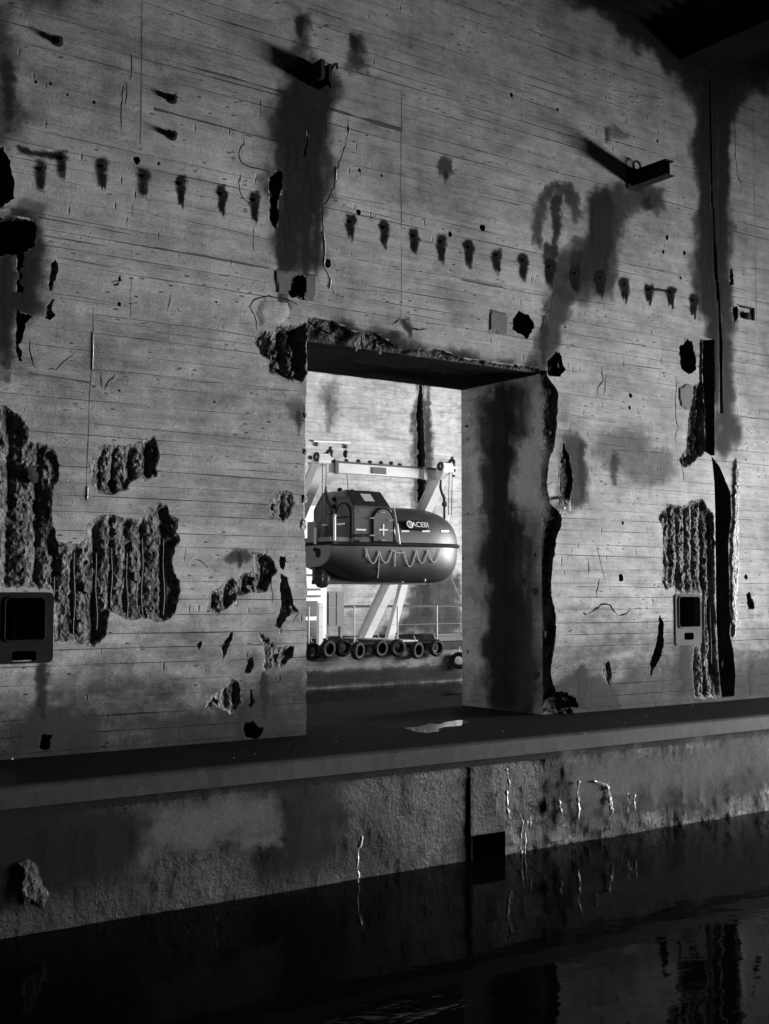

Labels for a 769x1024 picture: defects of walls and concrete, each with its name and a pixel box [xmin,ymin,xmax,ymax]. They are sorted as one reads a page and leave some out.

leakage [261,15,342,307]
spalling [0,405,181,647]
spalling [197,552,299,715]
spalling [254,317,579,715]
leakage [334,181,665,713]
spalling [512,311,534,340]
crack [583,546,630,616]
spalling [650,615,664,677]
leakage [617,20,754,639]
spalling [658,499,724,700]
spalling [679,339,706,468]
leakage [564,734,769,822]